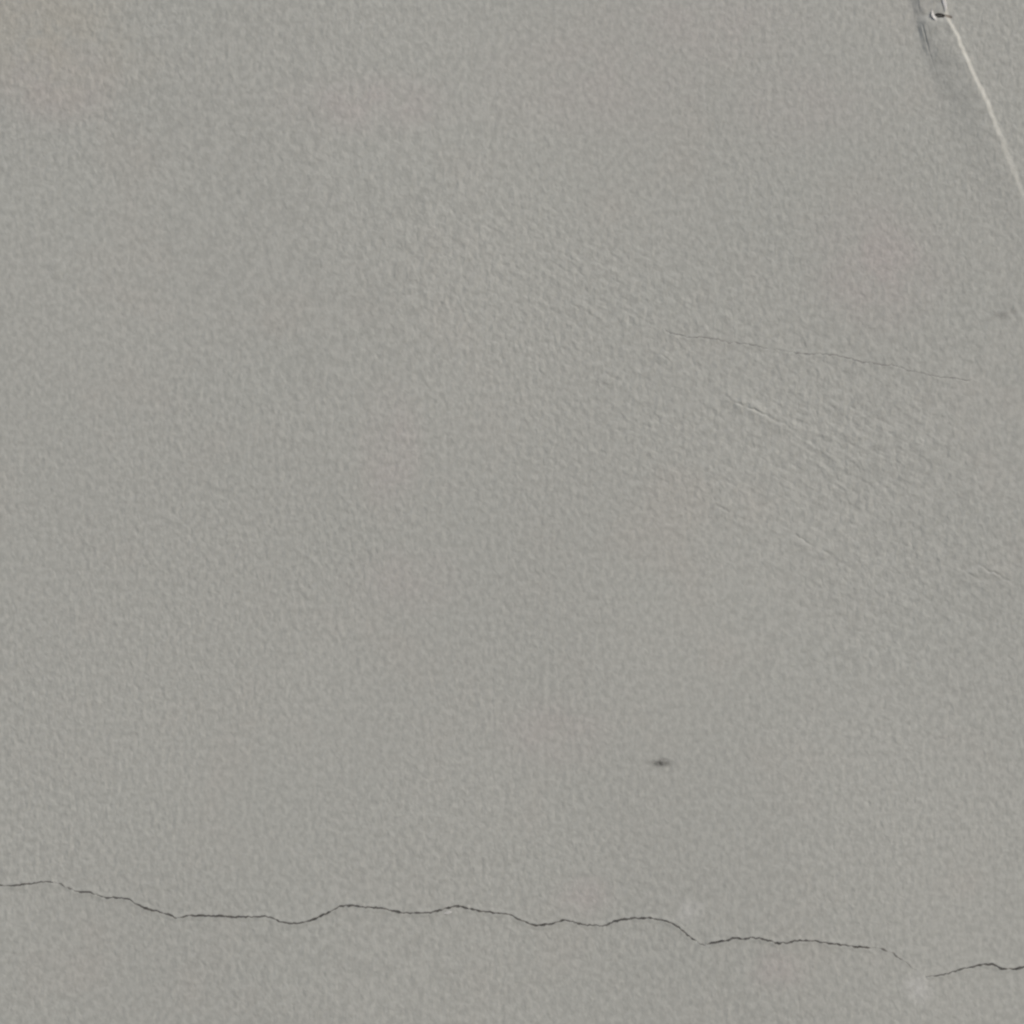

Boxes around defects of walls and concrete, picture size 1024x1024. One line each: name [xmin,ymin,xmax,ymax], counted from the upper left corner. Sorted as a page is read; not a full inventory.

crack [0,877,1024,981]